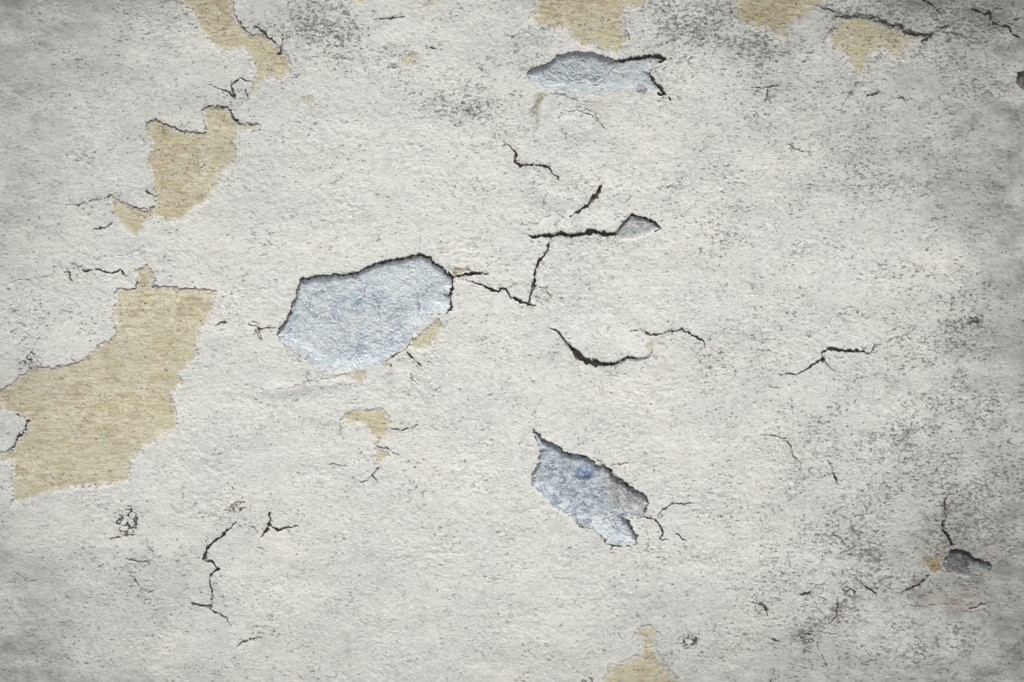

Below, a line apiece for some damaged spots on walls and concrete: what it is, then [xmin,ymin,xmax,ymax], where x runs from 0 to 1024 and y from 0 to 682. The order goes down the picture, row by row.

flaking render [180,0,292,101]
flaking render [527,0,674,130]
crack [826,0,1024,42]
flaking render [107,106,261,243]
crack [506,144,561,181]
flaking render [0,265,216,506]
flaking render [252,253,489,390]
crack [466,181,706,377]
crack [767,344,876,389]
crack [191,512,299,650]
flaking render [531,429,691,559]
flaking render [902,489,992,609]